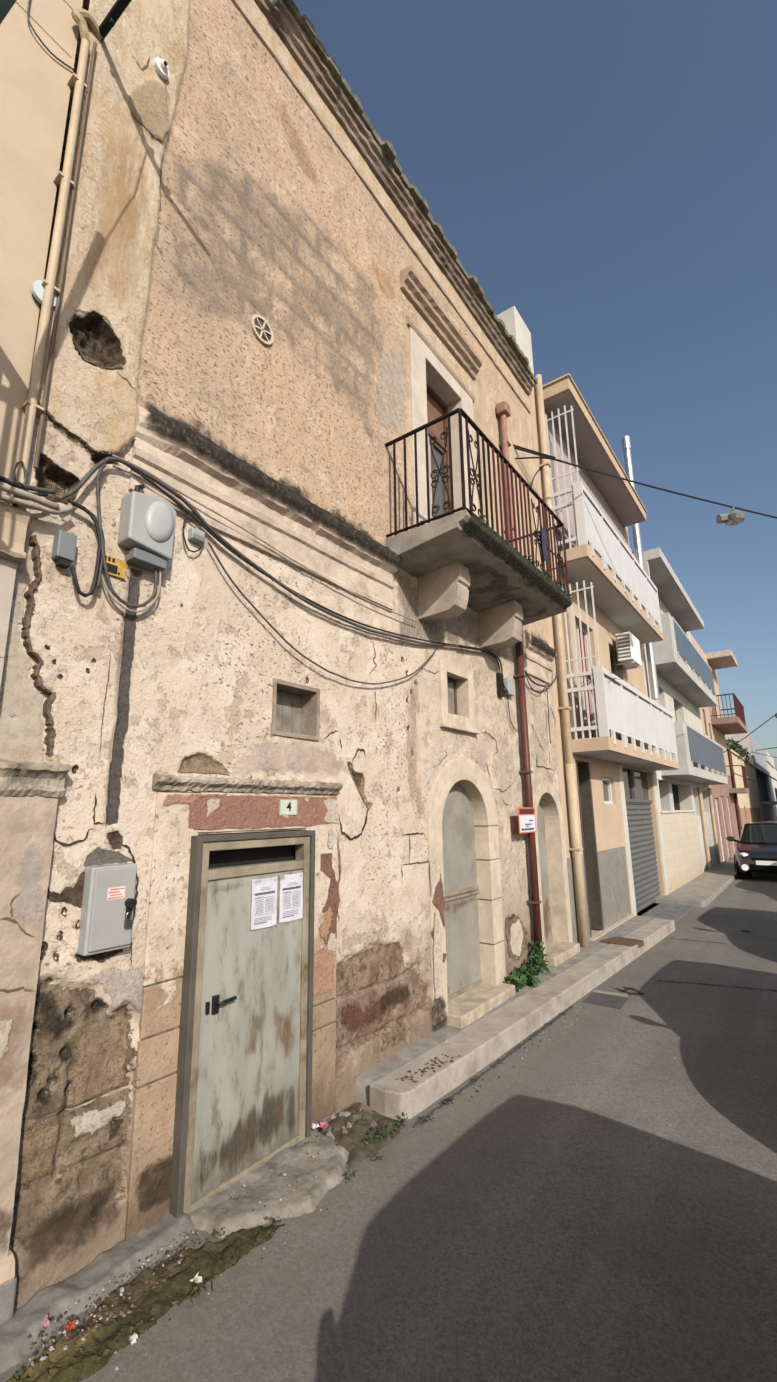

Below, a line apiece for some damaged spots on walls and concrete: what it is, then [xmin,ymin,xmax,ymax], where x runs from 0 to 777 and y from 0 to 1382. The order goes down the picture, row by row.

spalling [66,302,126,369]
leakage [177,164,406,435]
leakage [146,403,508,659]
spalling [178,752,230,775]
spalling [348,761,373,811]
spalling [164,793,447,1077]
spalling [0,871,143,1249]
leakage [137,1157,173,1210]
leakage [27,1192,116,1267]